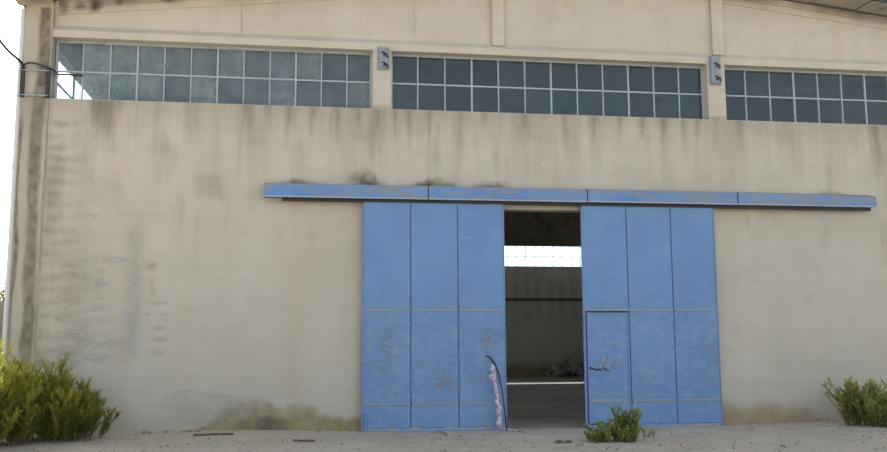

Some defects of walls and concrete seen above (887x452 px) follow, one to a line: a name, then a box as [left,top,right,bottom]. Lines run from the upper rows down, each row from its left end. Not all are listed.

leakage [202,406,361,431]